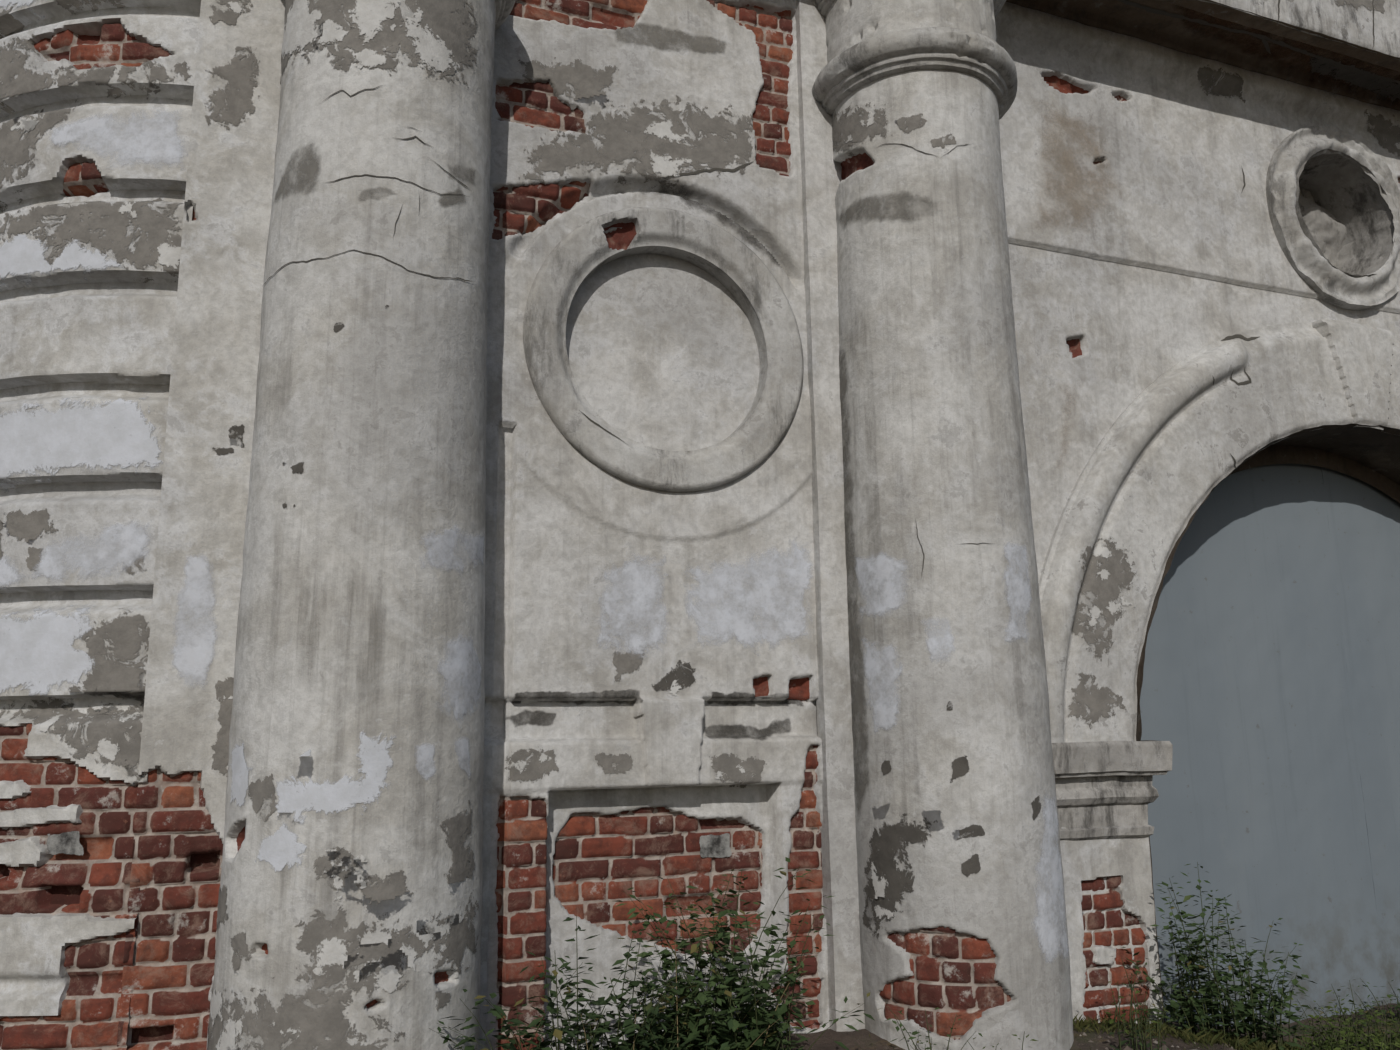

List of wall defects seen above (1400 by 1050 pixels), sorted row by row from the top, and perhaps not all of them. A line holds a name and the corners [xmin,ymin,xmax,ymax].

peeling [0,0,260,283]
crack [322,85,382,102]
crack [262,127,469,287]
peeling [280,0,478,88]
peeling [492,0,793,240]
peeling [651,660,696,696]
peeling [1068,536,1137,727]
flaking render [0,608,480,1050]
flaking render [495,747,765,1050]
flaking render [771,745,824,1029]
flaking render [863,814,1011,1040]
flaking render [1081,875,1150,1023]